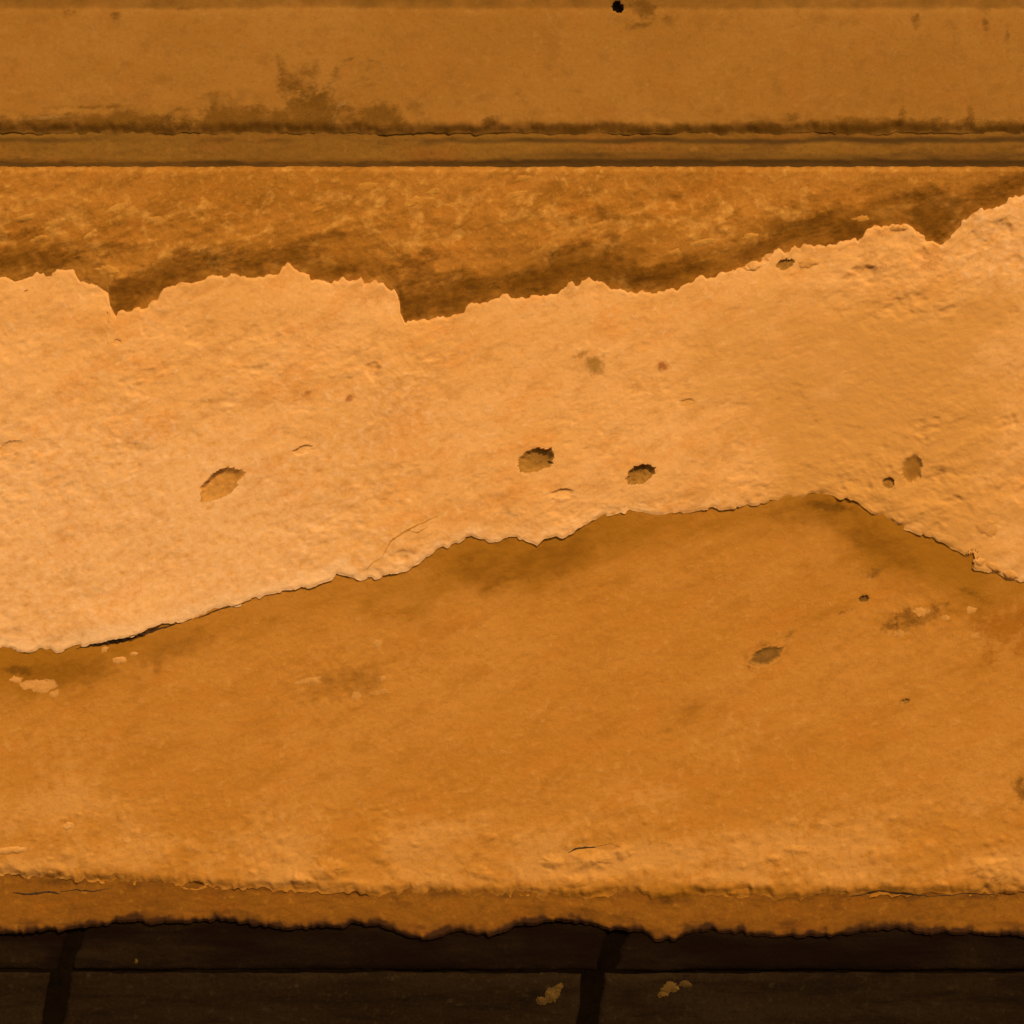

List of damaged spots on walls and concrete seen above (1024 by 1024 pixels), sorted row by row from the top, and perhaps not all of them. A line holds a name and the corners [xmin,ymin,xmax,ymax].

damp [0,105,187,132]
damp [200,81,405,132]
damp [792,113,943,132]
damp [956,118,1024,132]
flaking render [0,195,1024,664]
spalling [743,642,789,669]
peeling [9,676,59,698]